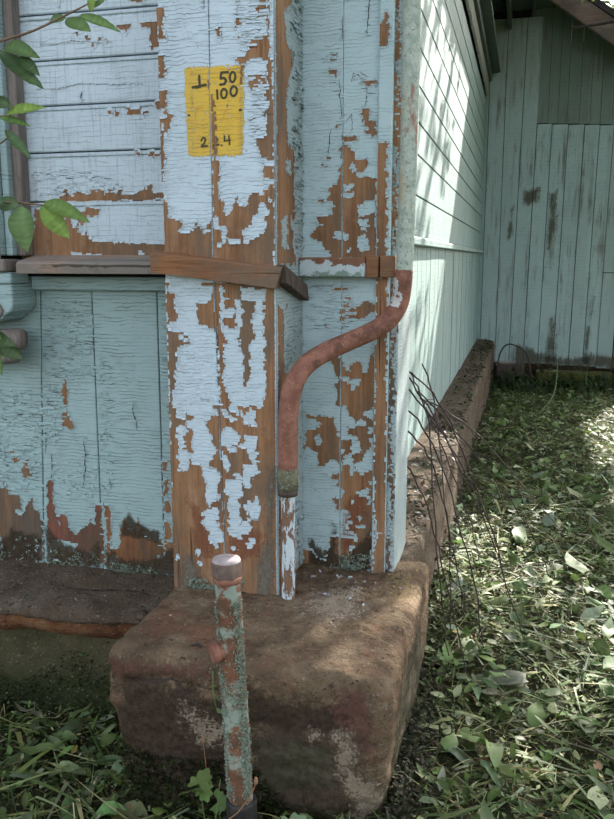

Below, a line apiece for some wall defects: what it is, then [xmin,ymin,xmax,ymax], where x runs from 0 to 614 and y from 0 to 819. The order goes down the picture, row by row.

peeling [23,0,297,268]
peeling [310,0,403,257]
peeling [323,277,394,331]
leakage [0,528,199,587]
leakage [121,515,159,543]
peeling [0,279,288,595]
peeling [295,325,399,573]
rust [342,495,366,554]